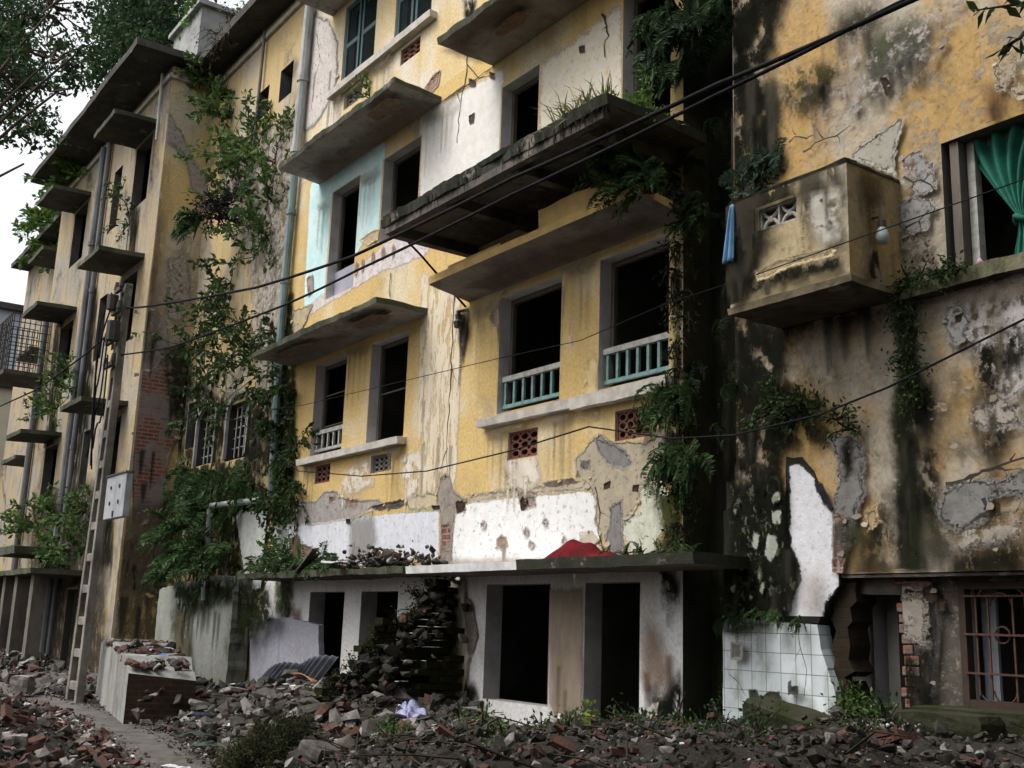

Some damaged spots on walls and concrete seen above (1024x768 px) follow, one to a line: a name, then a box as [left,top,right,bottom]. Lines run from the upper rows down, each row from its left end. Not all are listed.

crack [601,13,609,57]
crack [789,125,850,153]
peeling [219,13,339,410]
peeling [755,248,837,281]
leakage [720,0,875,617]
peeling [898,150,940,276]
peeling [923,272,1024,449]
peeling [282,423,673,563]
spalling [815,431,881,707]
leakage [856,384,939,573]
peeling [935,468,1024,559]
leakage [647,673,681,722]